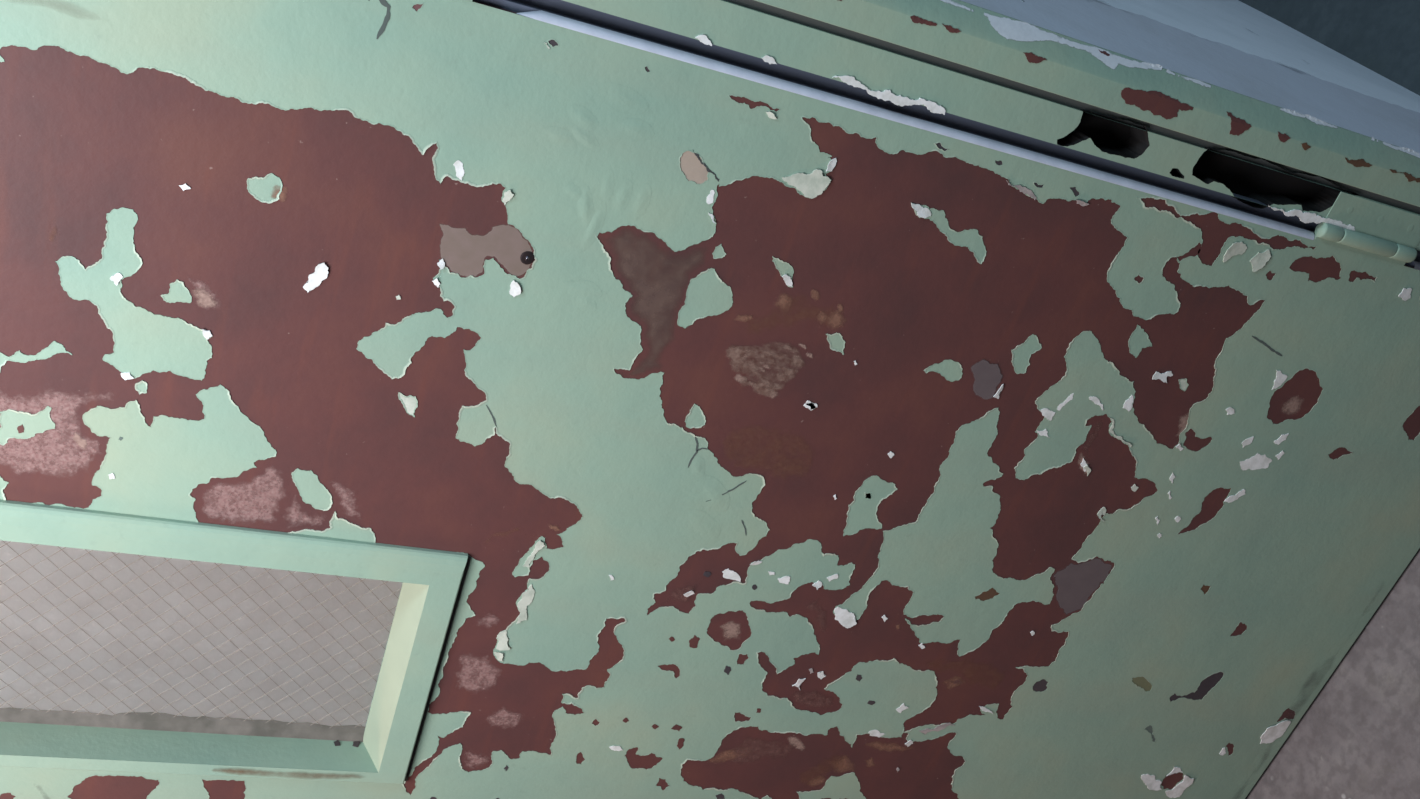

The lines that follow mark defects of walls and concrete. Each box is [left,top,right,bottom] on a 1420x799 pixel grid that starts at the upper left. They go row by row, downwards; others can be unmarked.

peeling [910,15,961,33]
flaking render [941,0,1211,88]
peeling [729,94,781,119]
peeling [1121,87,1194,119]
peeling [1227,112,1252,136]
flaking render [1280,108,1338,128]
flaking render [1371,137,1420,158]
peeling [0,44,628,799]
peeling [595,116,1378,799]